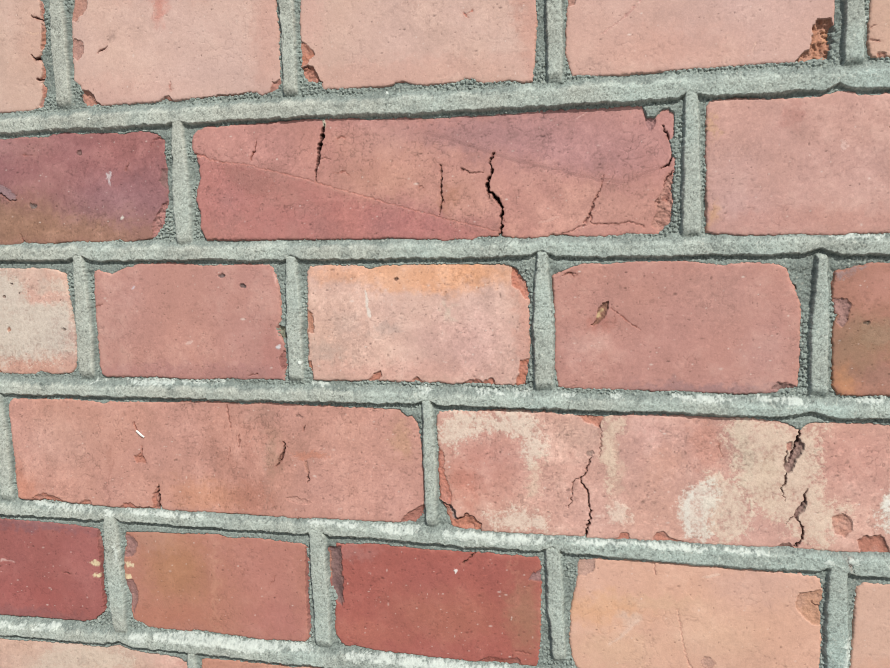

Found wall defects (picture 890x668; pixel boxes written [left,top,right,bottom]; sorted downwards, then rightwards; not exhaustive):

spalling [795,17,833,63]
crack [567,425,603,537]
damp [437,384,890,567]
crack [778,429,809,548]